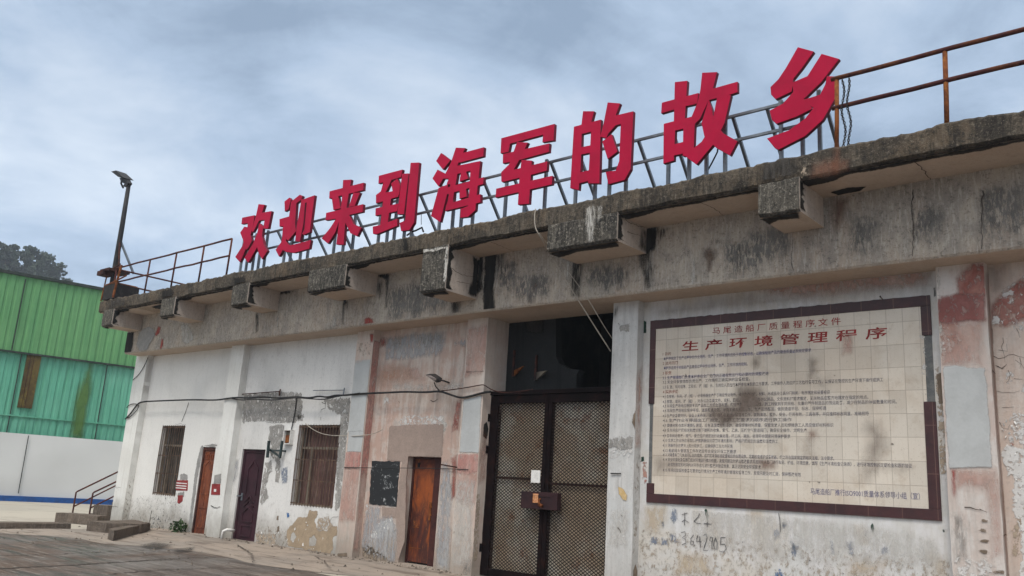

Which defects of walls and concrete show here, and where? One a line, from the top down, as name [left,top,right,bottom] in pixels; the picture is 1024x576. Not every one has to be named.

crack [911,162,931,256]
crack [979,191,987,249]
damp [310,229,548,326]
peeling [991,275,1024,331]
damp [72,370,90,438]
peeling [242,392,304,504]
peeling [255,397,351,553]
peeling [1001,412,1024,576]